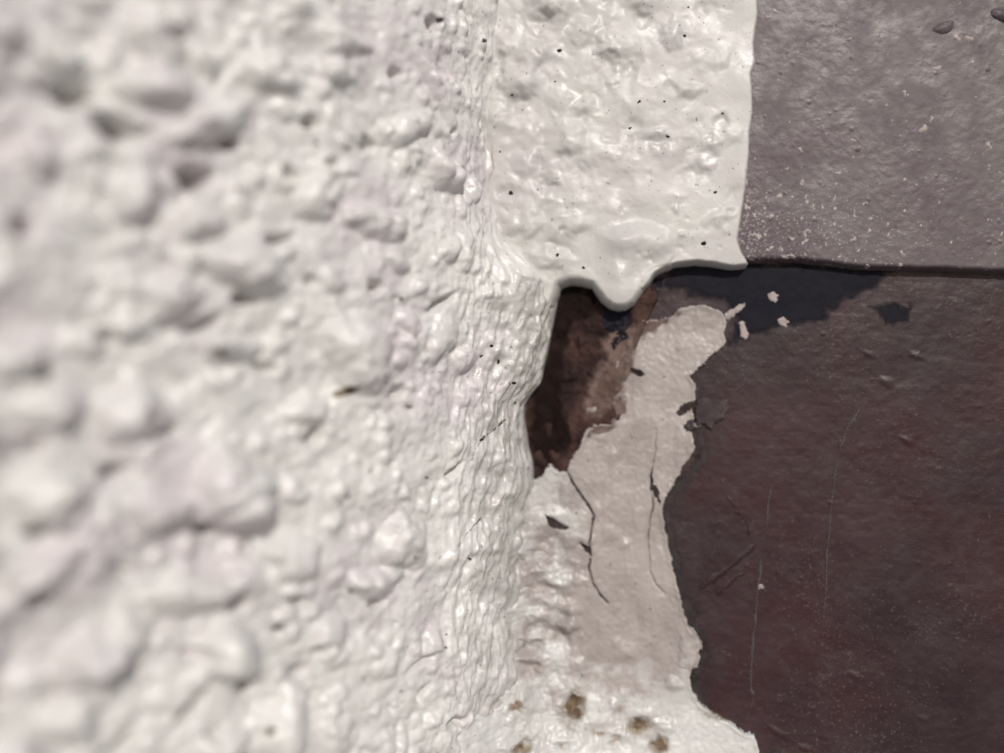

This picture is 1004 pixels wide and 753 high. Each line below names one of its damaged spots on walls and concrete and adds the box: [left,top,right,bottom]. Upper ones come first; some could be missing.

spalling [525,263,884,480]
crack [648,441,663,591]
crack [545,473,608,603]
corrosion [564,694,583,718]
corrosion [630,719,648,734]
corrosion [513,745,530,753]
corrosion [650,738,666,753]